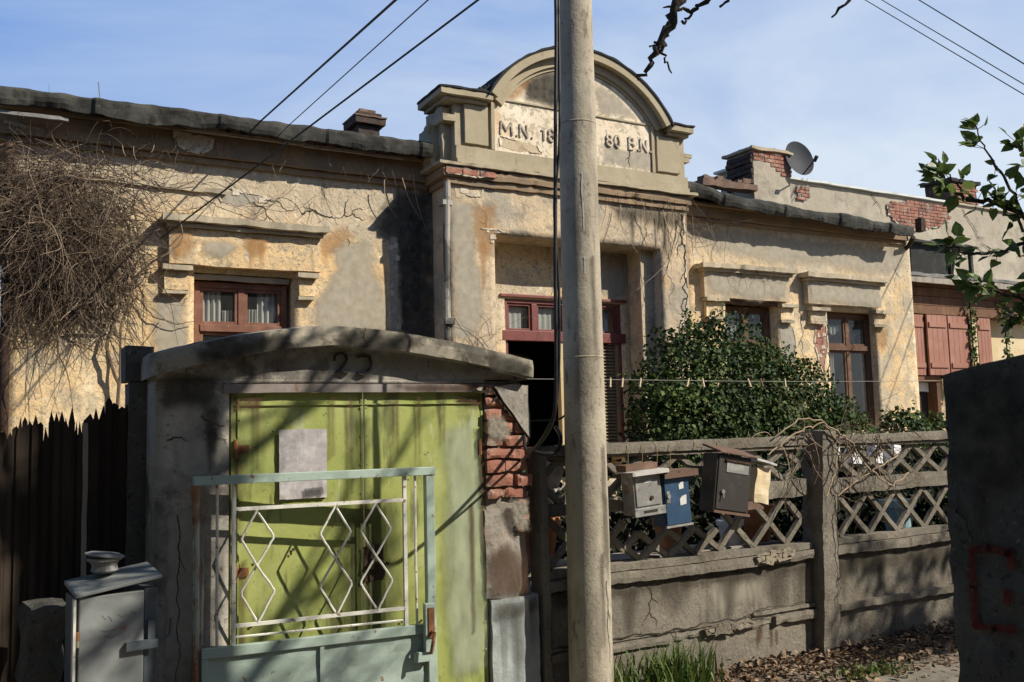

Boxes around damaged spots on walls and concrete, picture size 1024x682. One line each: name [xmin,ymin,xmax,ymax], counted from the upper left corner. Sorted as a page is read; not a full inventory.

crack [252,201,365,246]
flaking render [795,185,811,201]
flaking render [886,200,952,231]
flaking render [814,324,829,373]
peeling [494,384,530,438]
spalling [756,547,795,565]
crack [175,515,186,680]
crack [606,581,809,644]